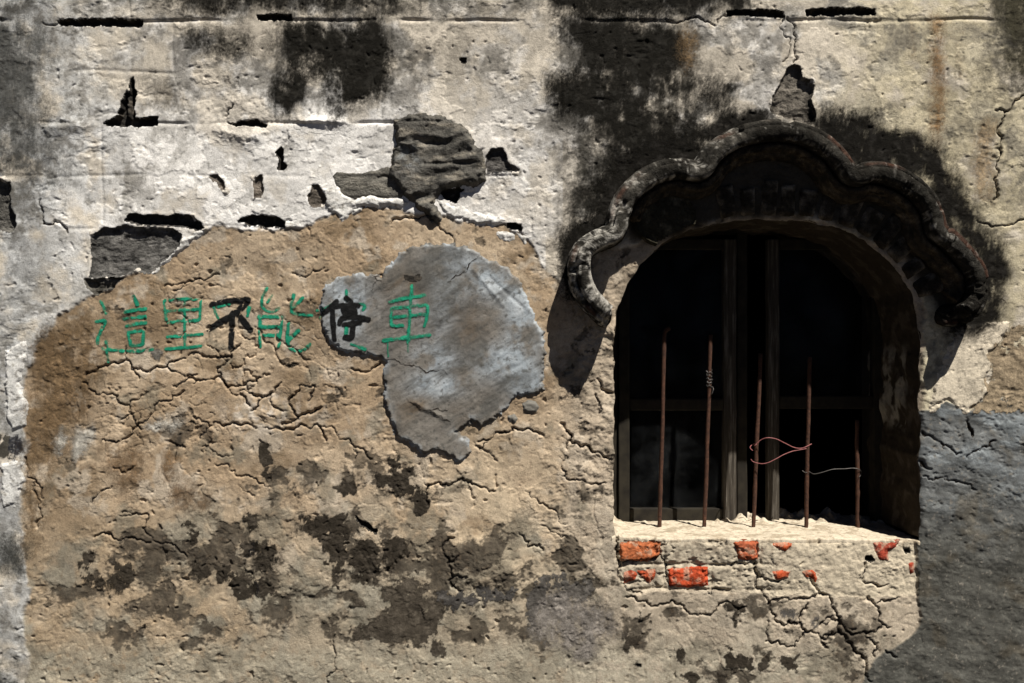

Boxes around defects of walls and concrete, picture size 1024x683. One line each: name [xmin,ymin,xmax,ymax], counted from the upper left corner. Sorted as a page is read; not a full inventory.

damp [166,0,402,117]
spalling [307,167,411,222]
damp [544,0,774,301]
spalling [769,64,817,125]
spalling [83,213,209,295]
damp [805,104,1024,414]
crack [88,344,370,498]
crack [425,478,494,497]
crack [478,423,612,485]
damp [299,512,643,662]
spalling [614,539,922,598]
crack [732,548,898,681]